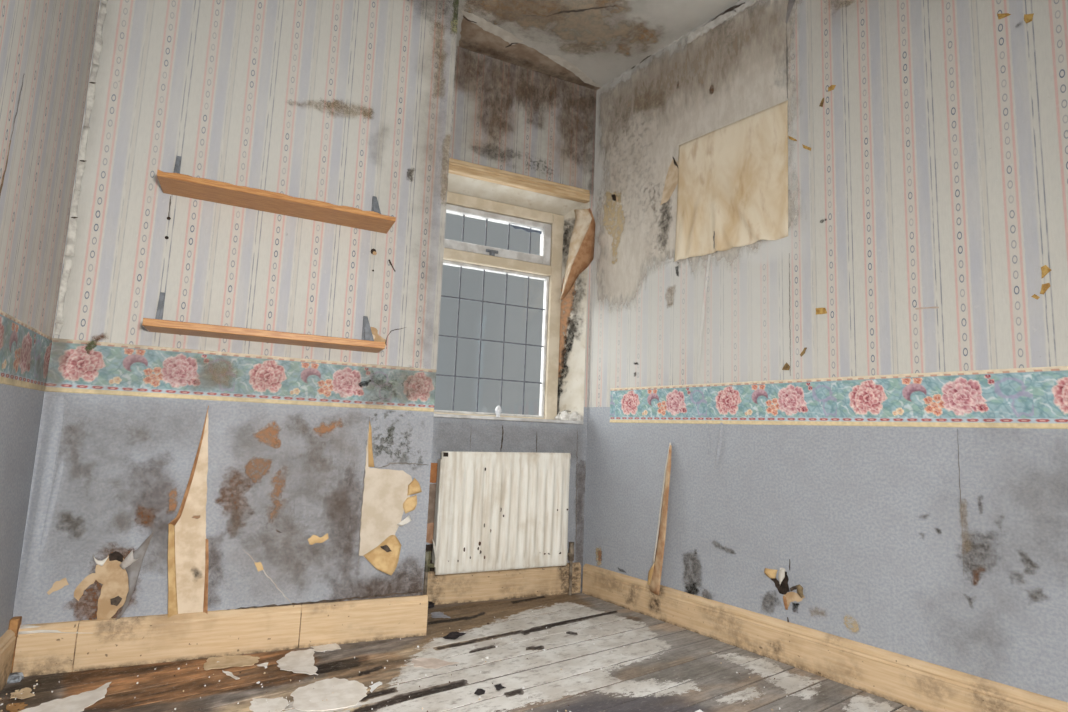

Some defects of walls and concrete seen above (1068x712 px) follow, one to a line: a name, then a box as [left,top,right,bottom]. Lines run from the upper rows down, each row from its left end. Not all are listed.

damp [467,0,656,55]
damp [457,50,594,164]
flaking render [597,0,799,305]
damp [313,421,342,436]
damp [135,488,177,529]
flaking render [175,413,209,614]
damp [216,472,253,531]
damp [269,470,285,521]
flaking render [359,433,422,575]
spalling [47,531,154,620]
spalling [764,559,805,622]
damp [964,537,989,585]